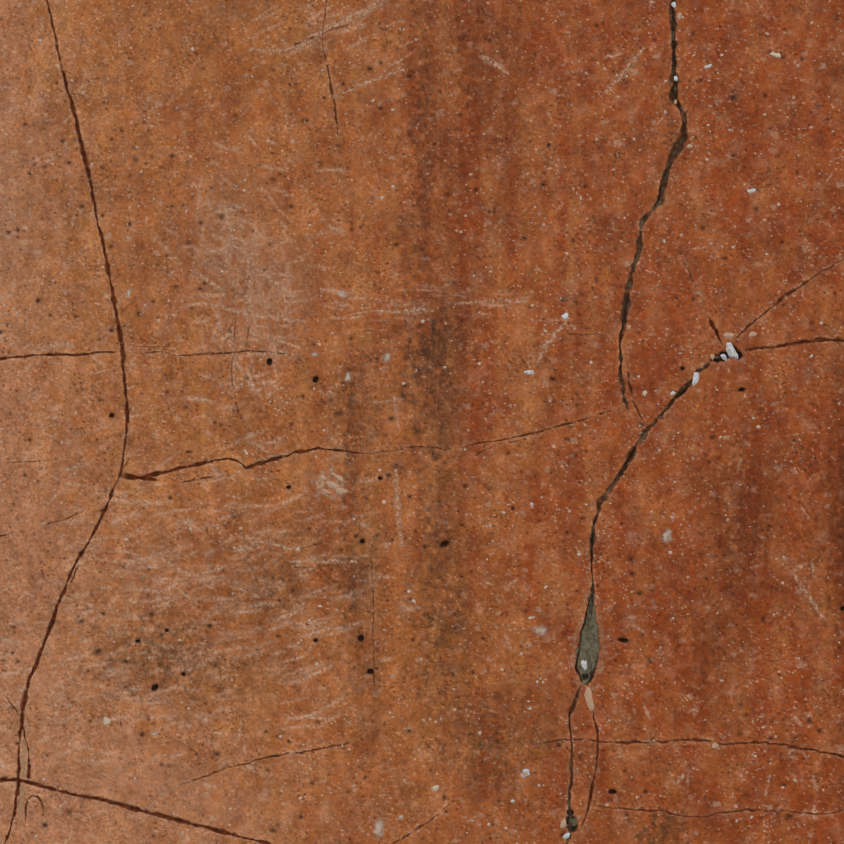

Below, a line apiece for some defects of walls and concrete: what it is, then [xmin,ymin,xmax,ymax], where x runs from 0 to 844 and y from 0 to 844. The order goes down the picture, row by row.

crack [588,0,844,603]
crack [0,0,361,844]
crack [468,412,604,446]
spalling [570,593,603,711]
crack [546,686,844,844]